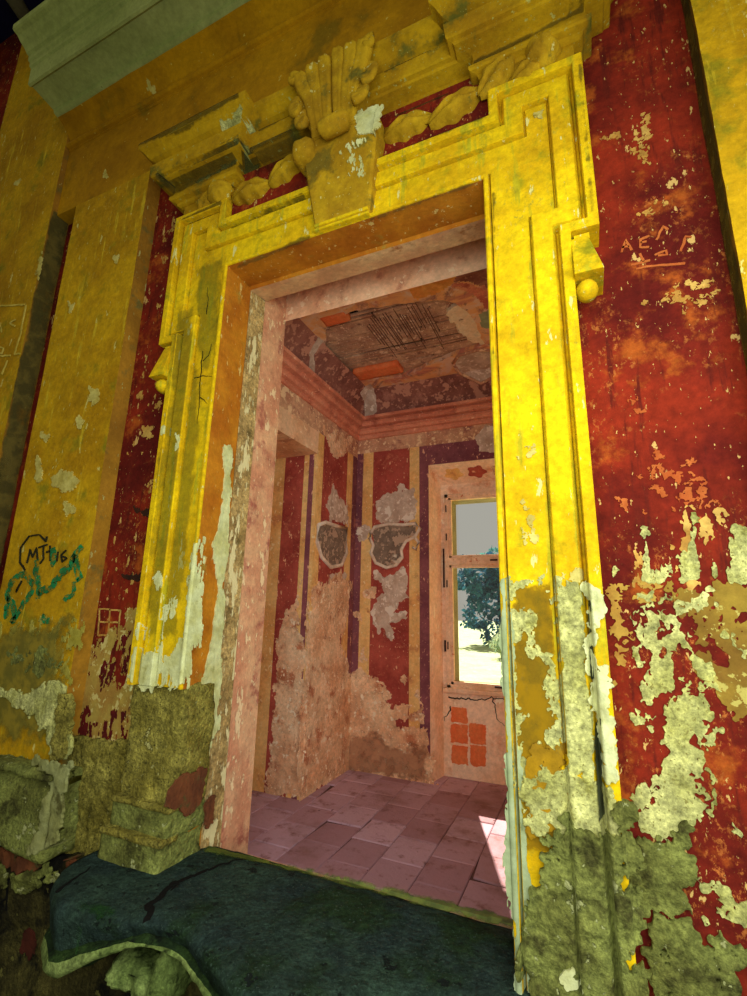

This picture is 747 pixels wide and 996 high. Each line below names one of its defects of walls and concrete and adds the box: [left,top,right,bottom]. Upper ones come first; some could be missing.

peeling [629,112,653,166]
peeling [636,199,668,217]
peeling [661,278,721,315]
flaking render [446,303,485,345]
peeling [88,385,100,407]
peeling [127,381,180,455]
crack [194,344,212,419]
flaking render [0,444,234,895]
flaking render [450,707,487,767]
crack [444,696,504,723]
flaking render [498,449,747,996]